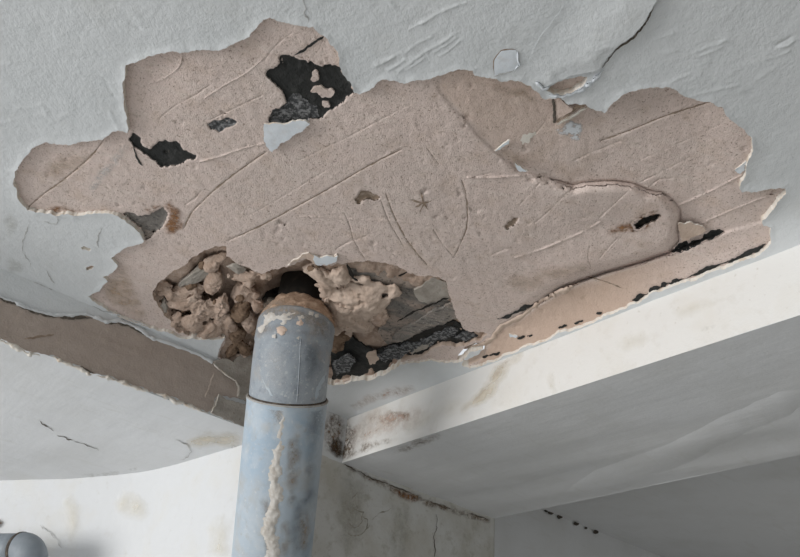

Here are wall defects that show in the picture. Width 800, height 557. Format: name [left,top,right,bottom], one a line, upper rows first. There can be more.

spalling [0,0,784,414]
water stain [331,439,344,456]